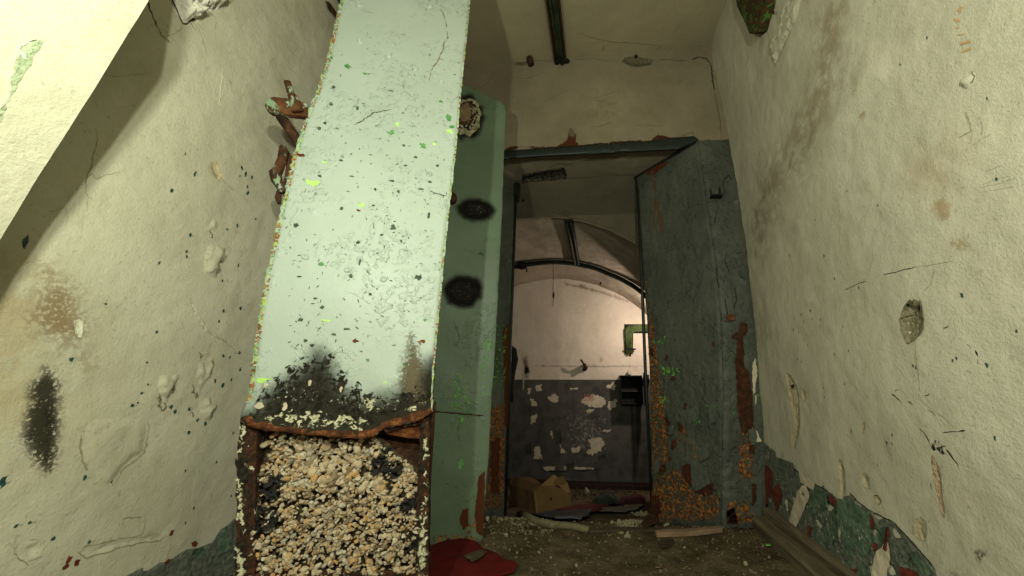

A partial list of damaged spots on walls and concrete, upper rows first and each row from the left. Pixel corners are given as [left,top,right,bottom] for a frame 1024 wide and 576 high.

peeling [0,39,43,121]
corrosion [245,0,344,403]
peeling [278,148,412,362]
flaking render [899,299,923,344]
mould [24,370,60,471]
corrosion [431,319,509,543]
peeling [527,384,559,424]
peeling [523,429,611,473]
peeling [570,382,617,414]
corrosion [647,314,761,526]
peeling [744,443,937,576]